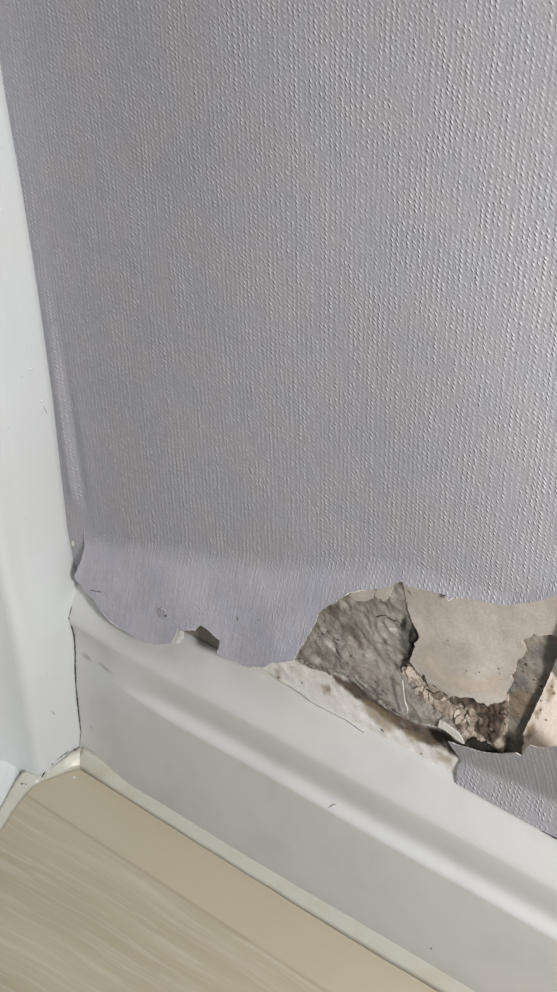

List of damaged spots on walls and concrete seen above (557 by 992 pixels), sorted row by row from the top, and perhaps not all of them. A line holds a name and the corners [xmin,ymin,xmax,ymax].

spalling [252,582,557,774]